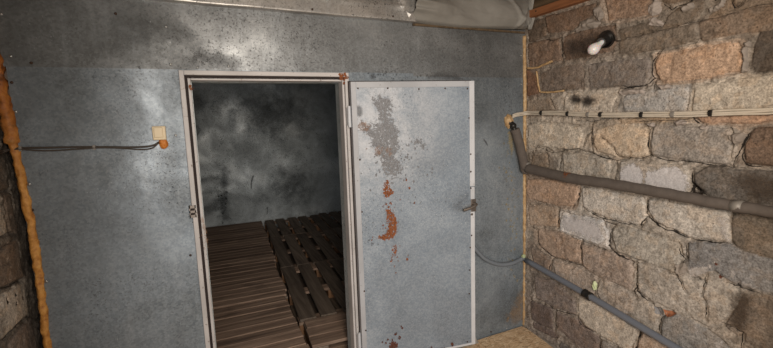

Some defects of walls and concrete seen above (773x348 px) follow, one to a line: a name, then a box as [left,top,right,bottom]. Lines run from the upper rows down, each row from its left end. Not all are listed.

peeling [358,94,428,184]
corrosion [371,180,409,273]